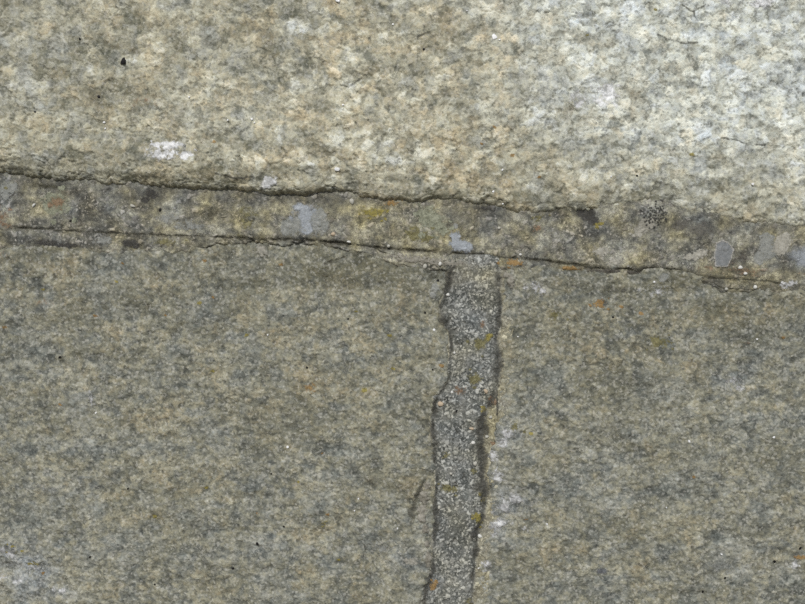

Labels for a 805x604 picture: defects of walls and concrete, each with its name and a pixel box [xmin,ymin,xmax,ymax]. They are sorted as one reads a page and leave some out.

crack [25,227,475,350]
crack [691,277,782,291]